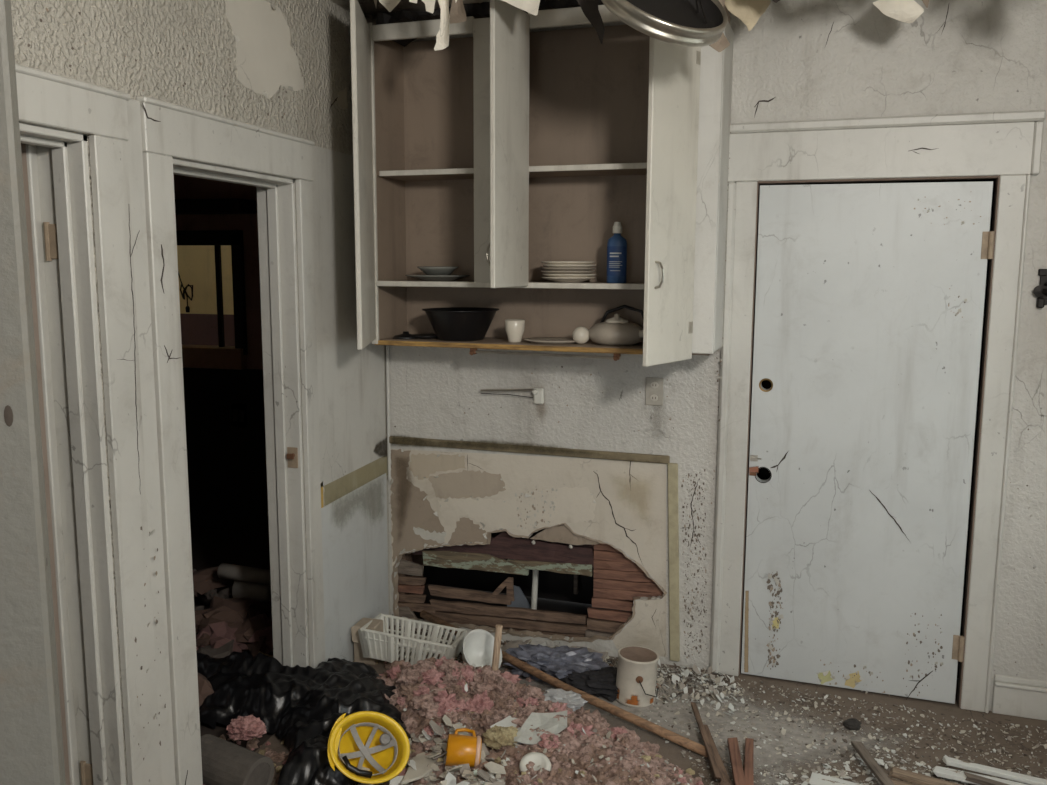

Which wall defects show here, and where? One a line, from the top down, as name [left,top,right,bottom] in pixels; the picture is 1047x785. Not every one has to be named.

peeling [379,0,467,51]
peeling [502,0,540,16]
peeling [577,0,605,44]
peeling [718,0,780,31]
peeling [873,0,929,23]
peeling [225,0,304,123]
crack [593,471,642,562]
crack [870,491,911,543]
flaking render [390,449,667,657]
peeling [681,469,715,659]
crack [906,671,933,700]